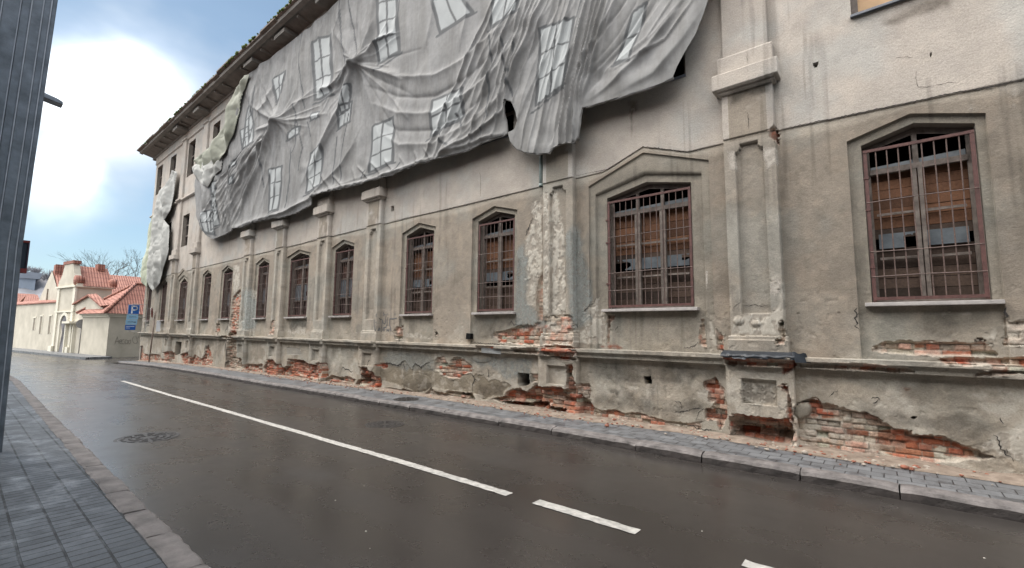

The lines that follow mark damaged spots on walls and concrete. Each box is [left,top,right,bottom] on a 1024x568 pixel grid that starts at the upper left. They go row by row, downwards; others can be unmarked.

flaking render [141,264,412,392]
flaking render [393,189,1024,466]